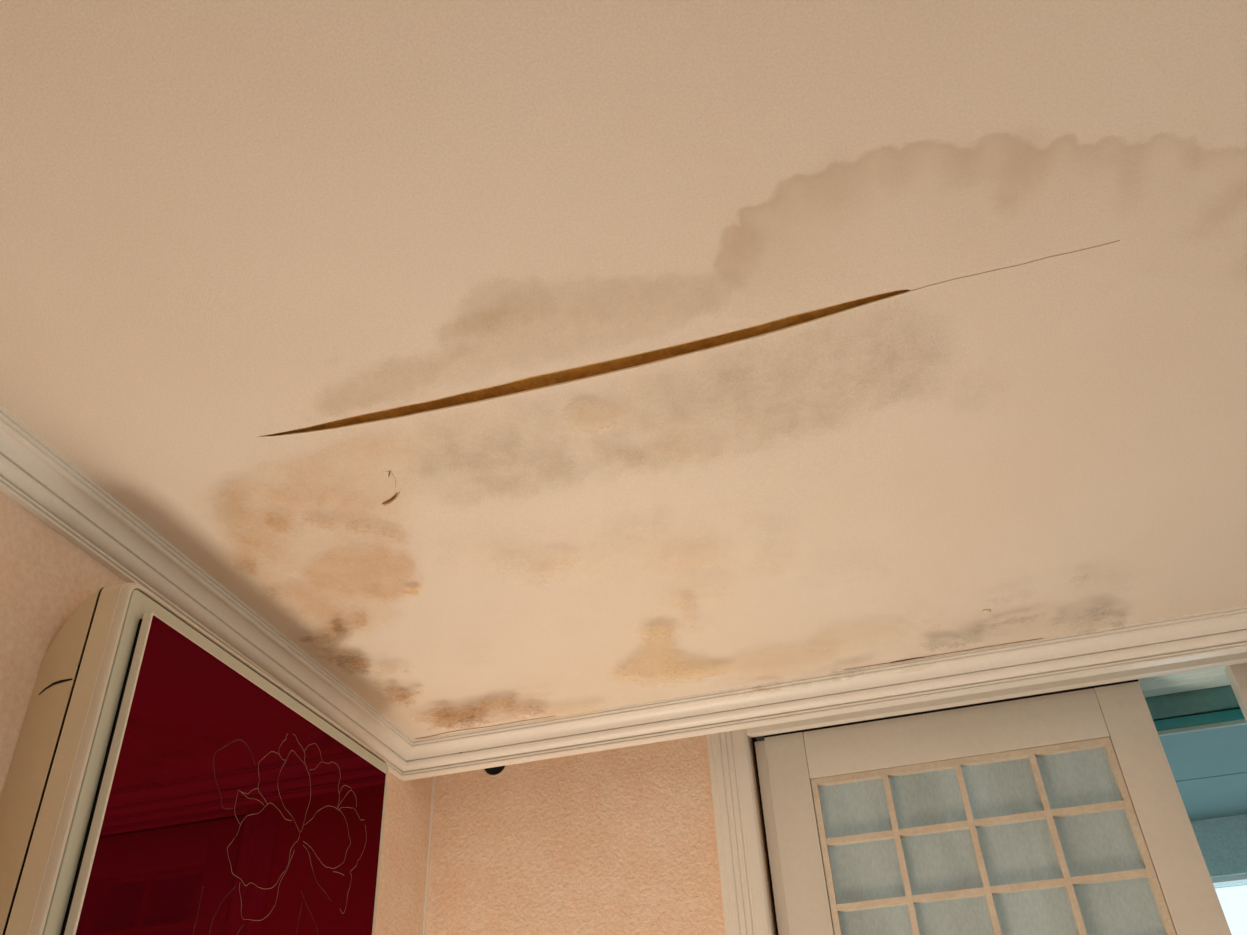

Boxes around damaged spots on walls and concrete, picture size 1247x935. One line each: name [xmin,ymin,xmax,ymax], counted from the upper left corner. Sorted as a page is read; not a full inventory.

crack [912,240,1120,291]